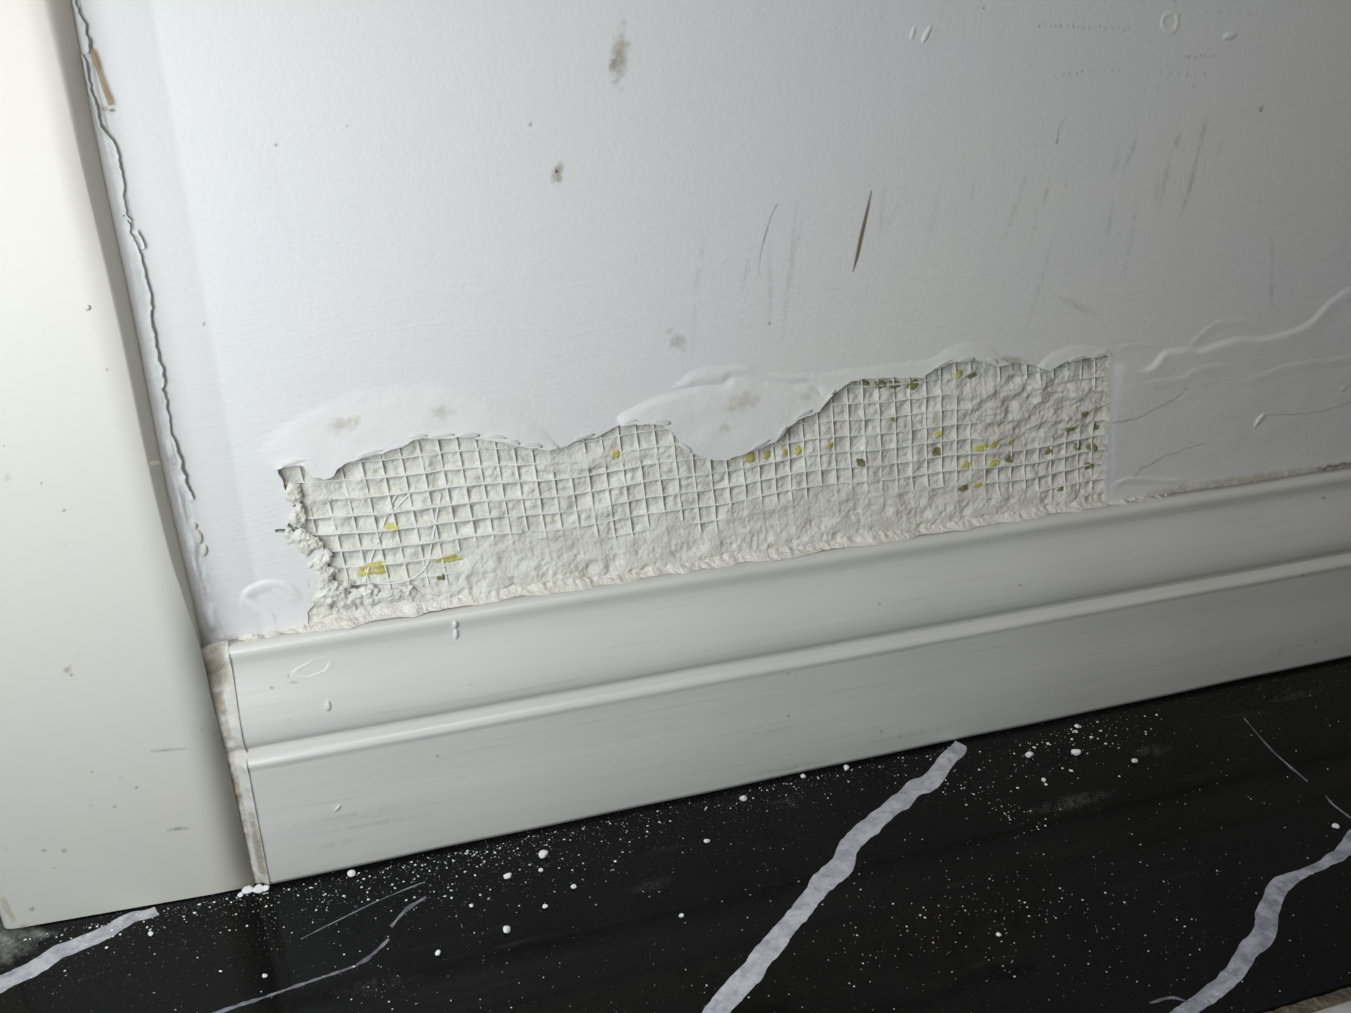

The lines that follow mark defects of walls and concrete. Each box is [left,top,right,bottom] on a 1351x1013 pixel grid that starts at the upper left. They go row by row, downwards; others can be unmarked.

crack [71,0,194,500]
flaking render [278,286,1351,624]